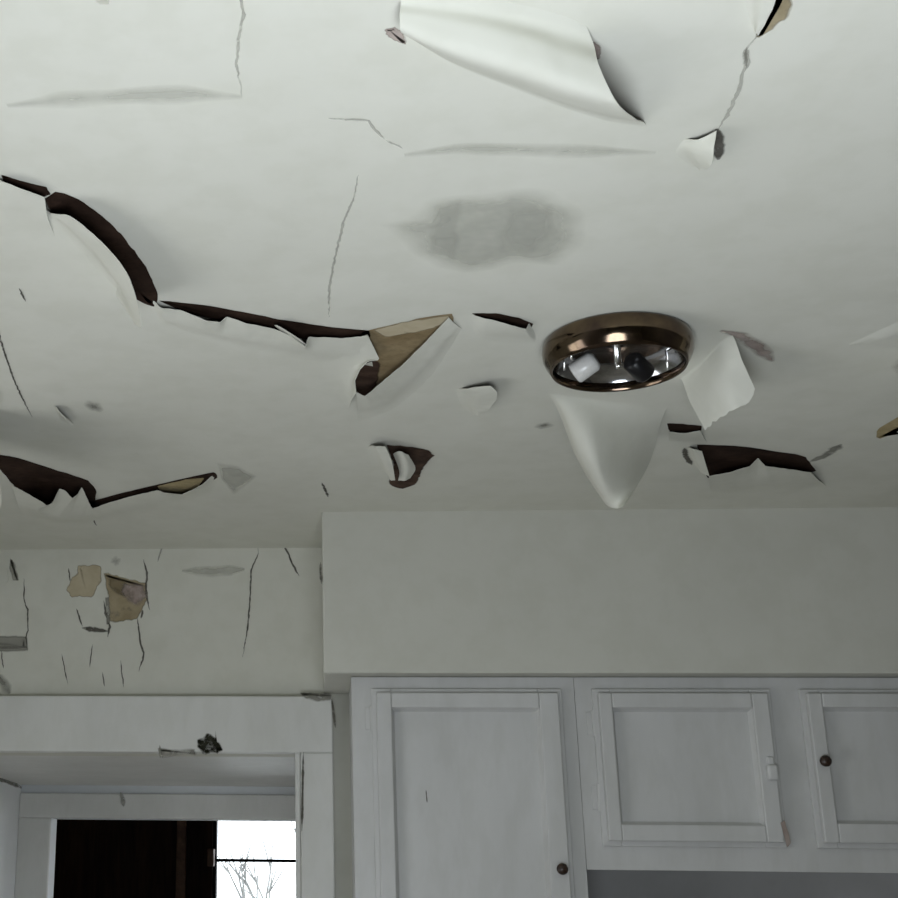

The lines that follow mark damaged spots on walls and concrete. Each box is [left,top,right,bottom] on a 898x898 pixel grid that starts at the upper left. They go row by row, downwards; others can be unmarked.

peeling [744,0,792,37]
peeling [385,0,646,126]
crack [719,50,750,127]
leakage [417,201,562,263]
peeling [0,175,536,420]
crack [0,335,32,416]
peeling [548,330,841,508]
peeling [0,455,217,528]
peeling [367,445,435,489]
crack [76,551,161,687]
crack [243,555,258,654]
crack [284,548,323,583]